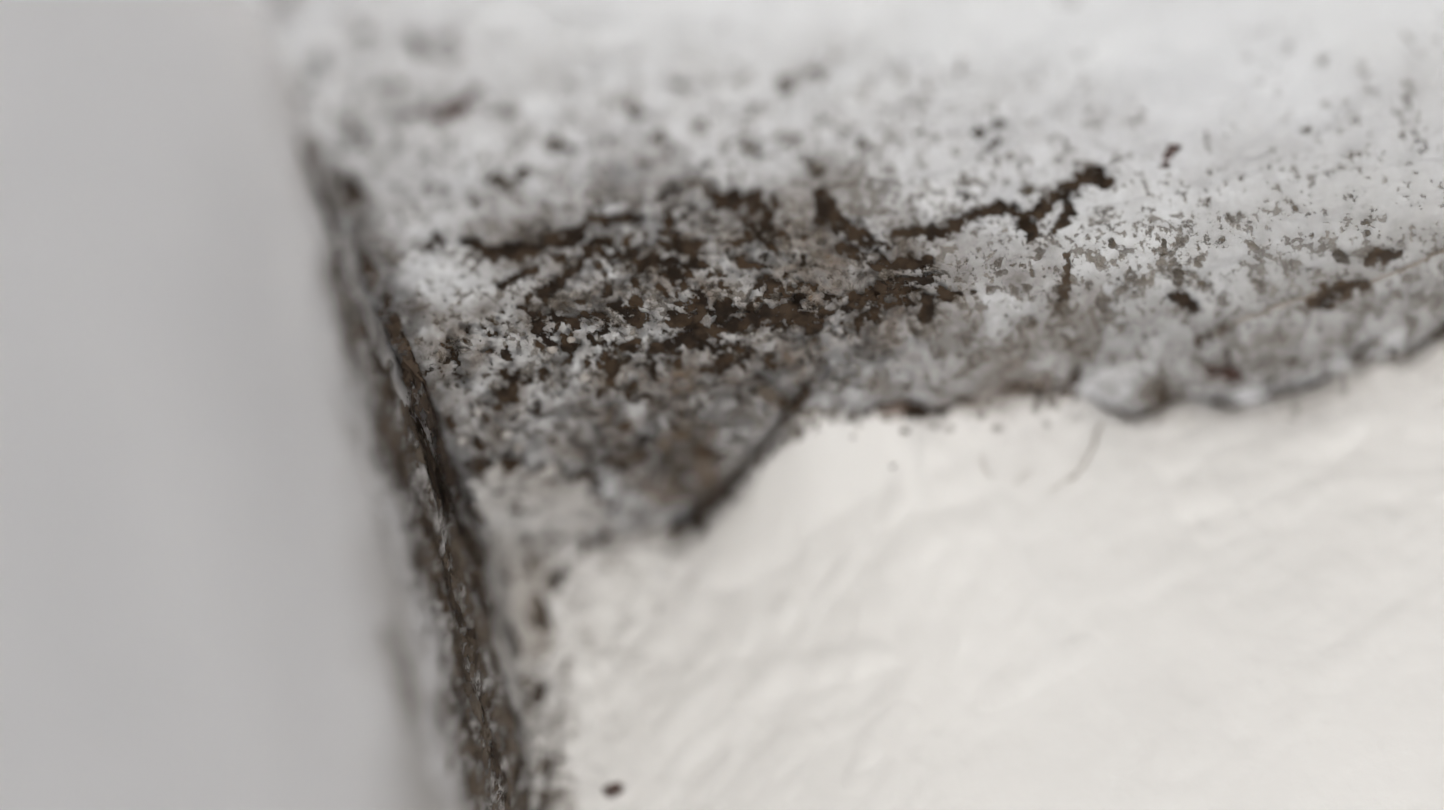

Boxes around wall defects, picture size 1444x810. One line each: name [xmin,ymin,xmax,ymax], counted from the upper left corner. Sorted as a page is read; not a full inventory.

peeling [1378,325,1436,350]
damp [280,16,1444,810]
peeling [1083,358,1154,408]
peeling [1232,381,1273,408]